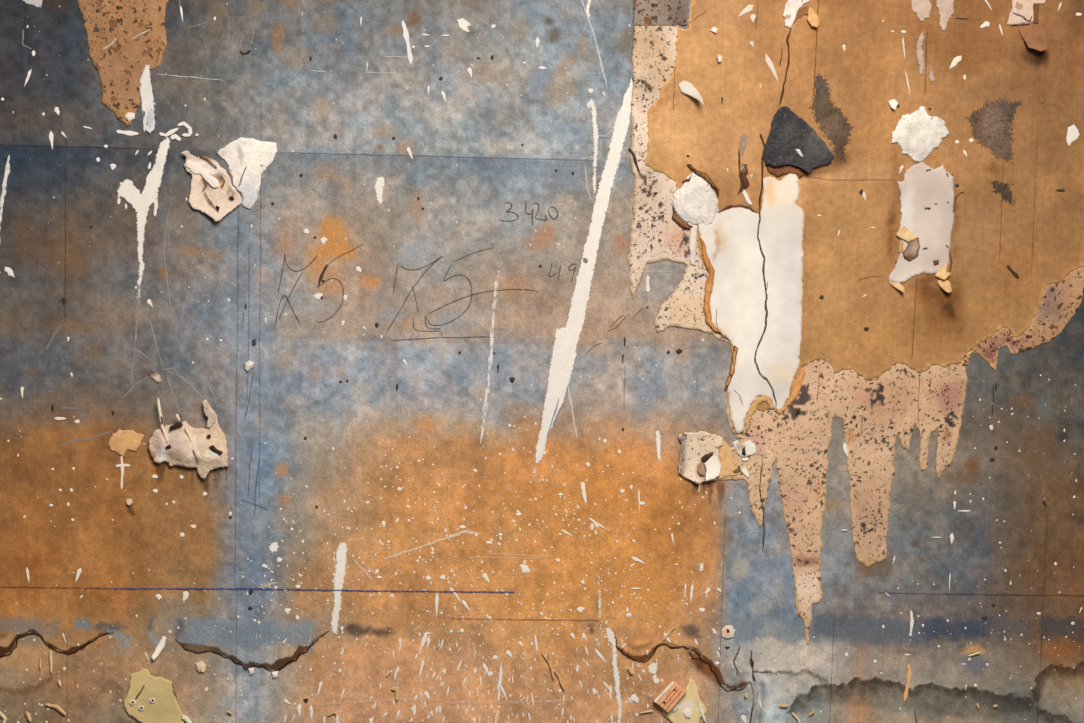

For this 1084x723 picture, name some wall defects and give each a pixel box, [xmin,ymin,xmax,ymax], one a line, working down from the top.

peeling [807,7,820,27]
crack [779,28,791,106]
peeling [682,164,719,197]
peeling [672,206,693,229]
peeling [896,225,918,253]
crack [738,133,777,412]
peeling [935,262,952,293]
spalling [733,440,756,478]
crack [0,629,114,658]
crack [179,631,329,672]
crack [615,638,770,723]
leakage [789,662,1084,723]